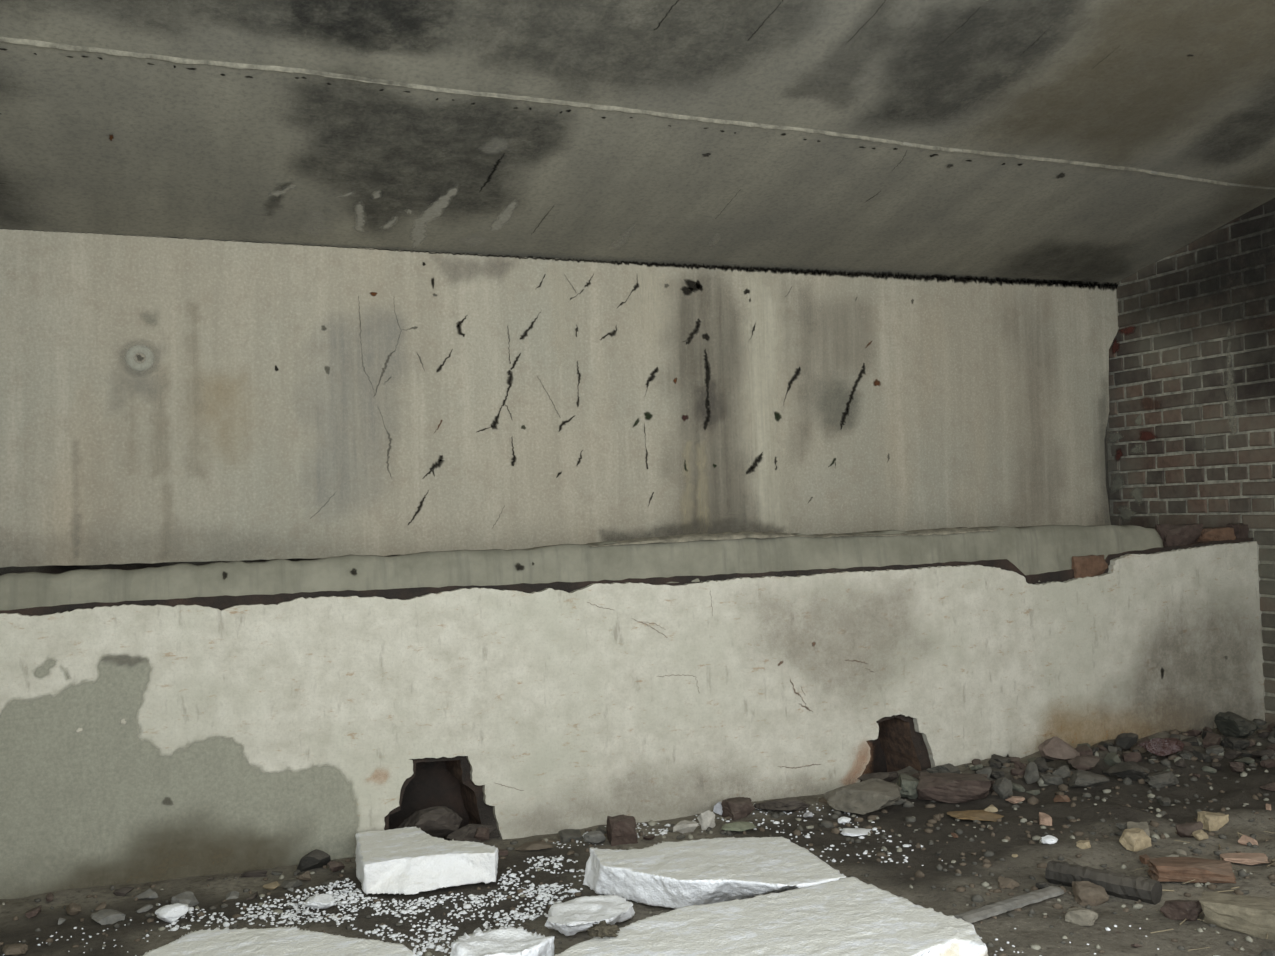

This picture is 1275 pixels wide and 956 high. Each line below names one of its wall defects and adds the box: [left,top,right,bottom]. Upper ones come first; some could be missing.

leakage [341,191,380,231]
leakage [383,188,457,248]
crack [358,296,466,476]
crack [477,274,639,478]
crack [645,367,658,395]
crack [682,318,711,430]
leakage [648,281,782,536]
crack [784,367,801,402]
crack [840,340,873,429]
crack [408,420,444,525]
crack [746,452,777,474]
peeling [0,656,359,899]